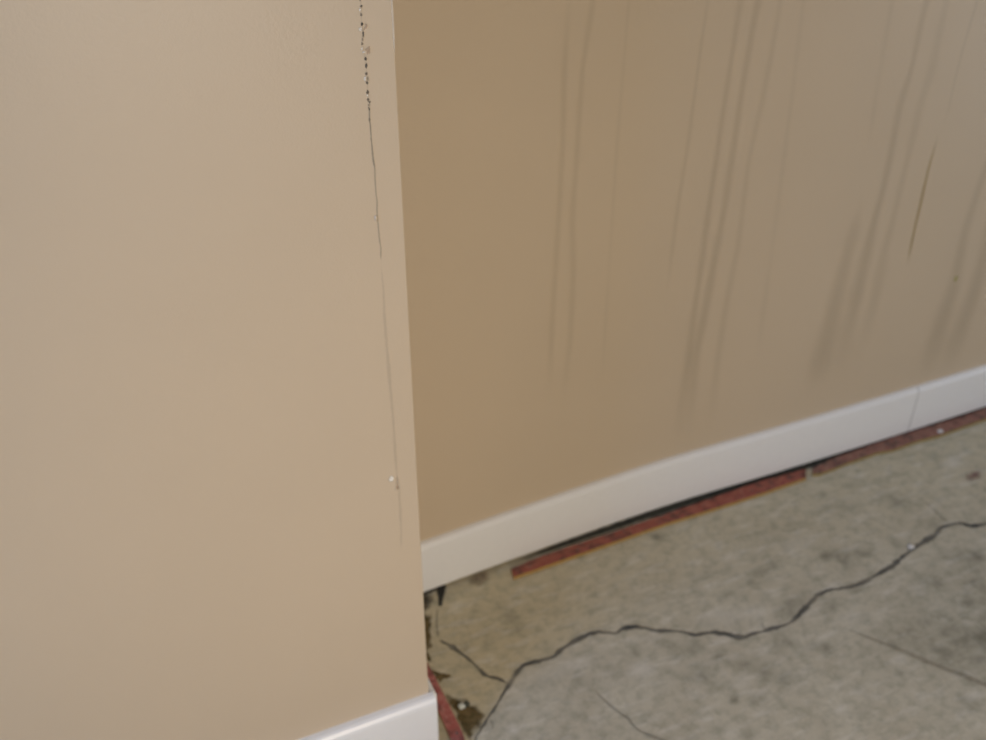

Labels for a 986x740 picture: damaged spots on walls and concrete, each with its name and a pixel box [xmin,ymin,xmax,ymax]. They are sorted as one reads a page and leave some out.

crack [359,5,371,103]
spalling [424,615,451,682]
crack [436,585,446,606]
crack [440,522,984,729]
spalling [448,696,484,737]